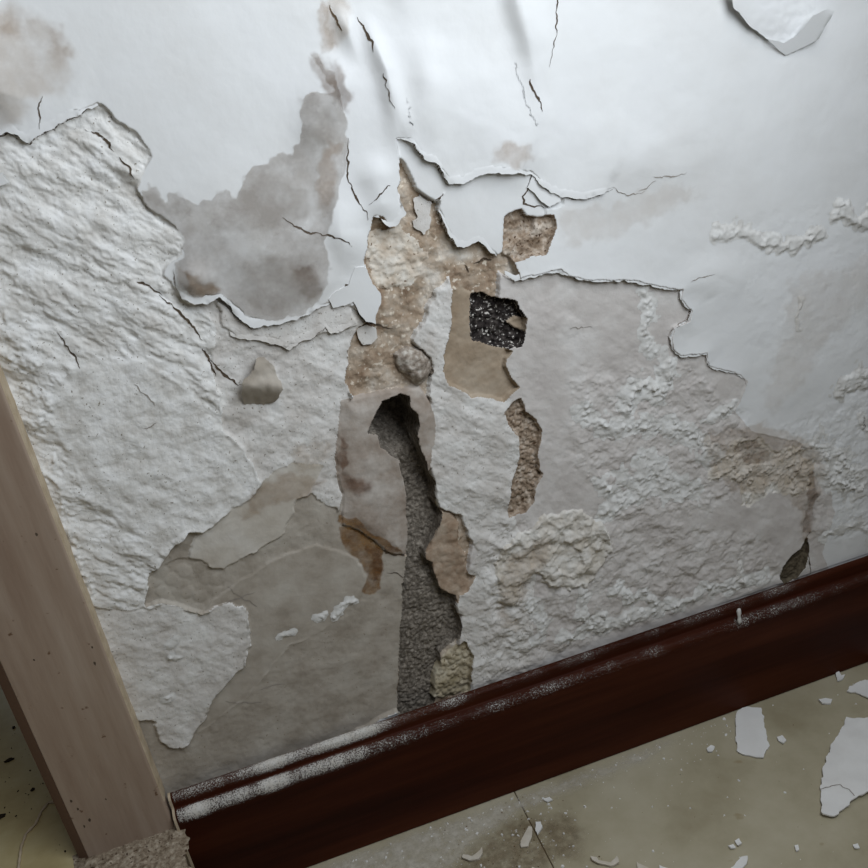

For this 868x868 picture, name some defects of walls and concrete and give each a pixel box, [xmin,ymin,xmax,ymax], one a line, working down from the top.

crack [329,7,374,50]
crack [549,0,559,67]
peeling [732,0,836,55]
crack [529,79,542,109]
crack [346,139,390,217]
flaking render [334,137,868,670]
flaking render [0,102,478,812]
peeling [735,707,786,758]